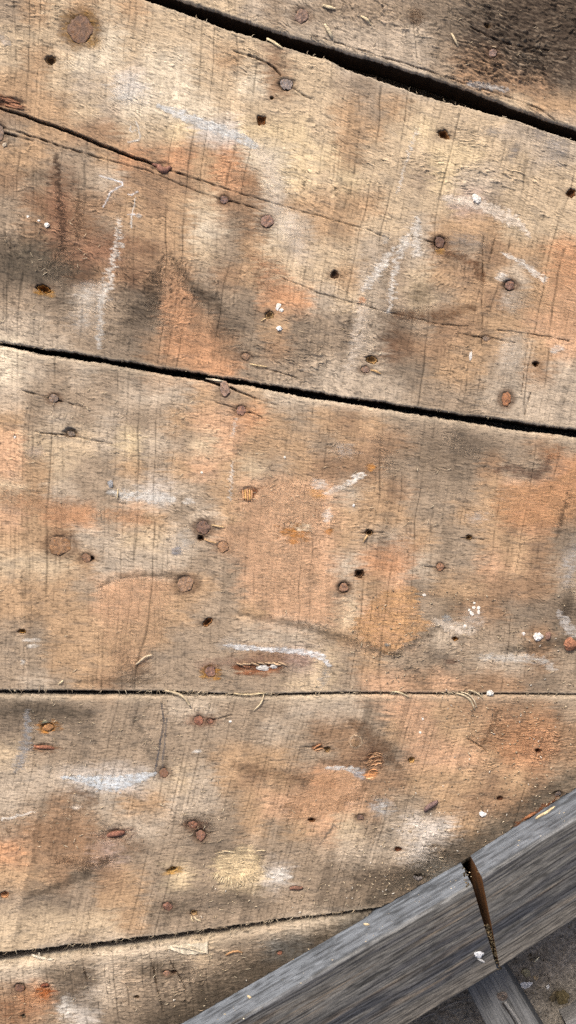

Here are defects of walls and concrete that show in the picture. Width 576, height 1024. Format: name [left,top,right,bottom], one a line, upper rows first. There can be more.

crack [0,108,253,208]